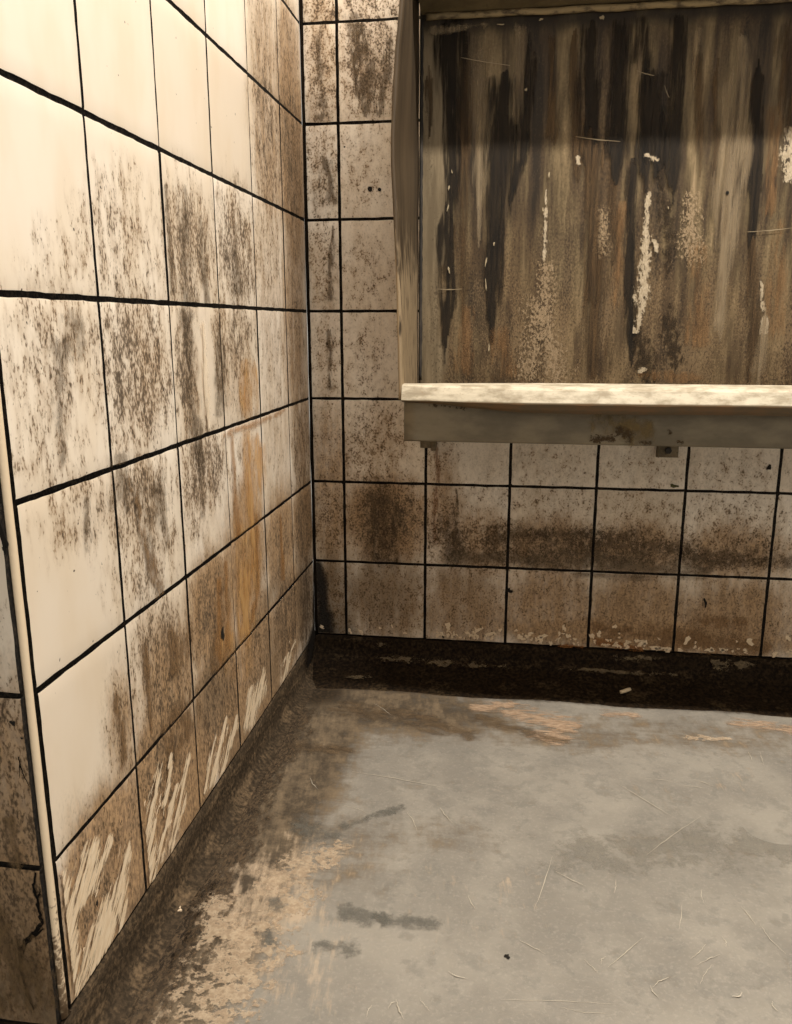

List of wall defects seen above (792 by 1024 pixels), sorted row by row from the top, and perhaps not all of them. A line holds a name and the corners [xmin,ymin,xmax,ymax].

leakage [315,31,326,120]
leakage [348,13,392,117]
leakage [778,24,792,183]
leakage [425,19,537,355]
leakage [518,16,767,384]
leakage [128,476,164,604]
corrosion [217,409,284,657]
leakage [436,521,792,580]
leakage [114,695,128,768]
leakage [142,641,194,777]
peeling [436,622,755,676]
crack [18,873,44,1011]